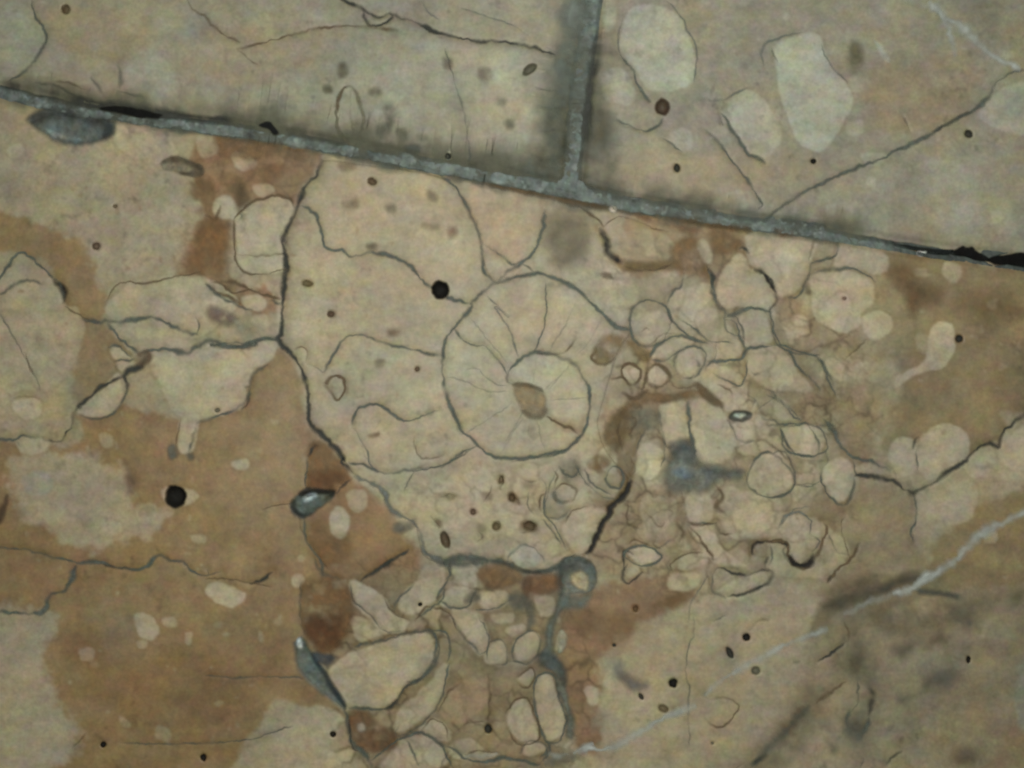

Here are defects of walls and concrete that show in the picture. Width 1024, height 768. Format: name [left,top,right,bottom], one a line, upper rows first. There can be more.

crack [343,0,392,30]
crack [422,25,553,70]
crack [723,90,988,213]
damp [493,185,539,195]
damp [557,198,601,208]
crack [819,255,873,279]
crack [577,206,834,400]
crack [0,171,417,526]
crack [941,418,1020,477]
crack [622,406,916,597]
crack [3,556,221,615]
crack [346,466,631,765]